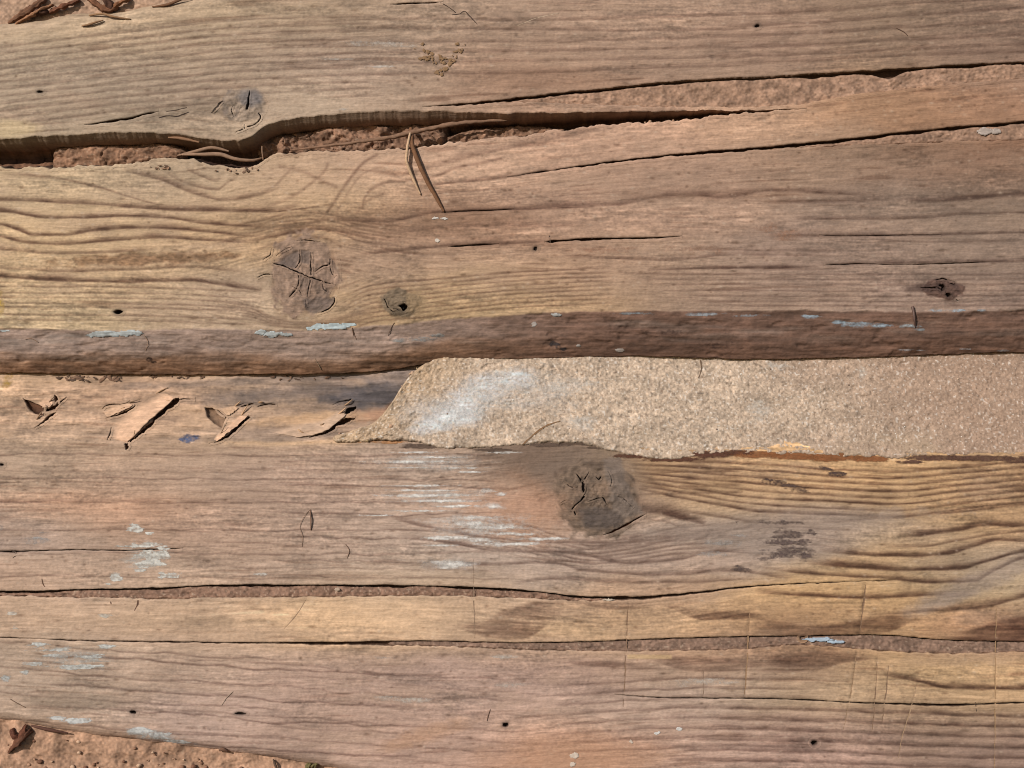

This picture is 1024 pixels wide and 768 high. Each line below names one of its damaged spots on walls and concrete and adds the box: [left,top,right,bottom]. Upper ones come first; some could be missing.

crack [0,58,1024,181]
crack [448,240,499,250]
crack [544,233,682,246]
spalling [21,397,54,417]
peeling [104,392,175,442]
spalling [203,405,247,441]
peeling [269,411,346,437]
crack [0,577,896,611]
crack [0,631,1024,658]